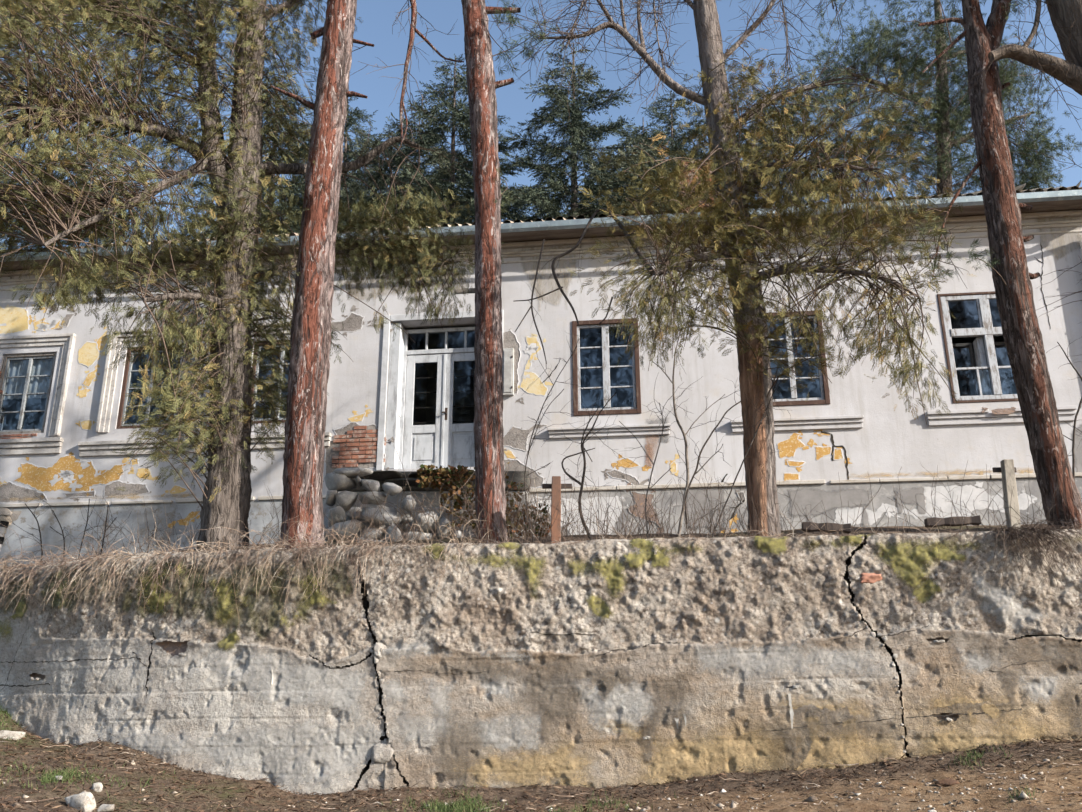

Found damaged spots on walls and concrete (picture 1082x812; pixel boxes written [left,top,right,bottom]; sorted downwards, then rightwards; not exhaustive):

peeling [0,291,77,335]
peeling [76,327,109,398]
peeling [503,328,553,404]
peeling [0,452,188,526]
flaking render [323,404,395,482]
peeling [776,430,853,481]
crack [821,431,849,480]
crack [0,610,156,697]
crack [309,562,489,791]
crack [754,532,1082,758]
damp [404,652,893,789]